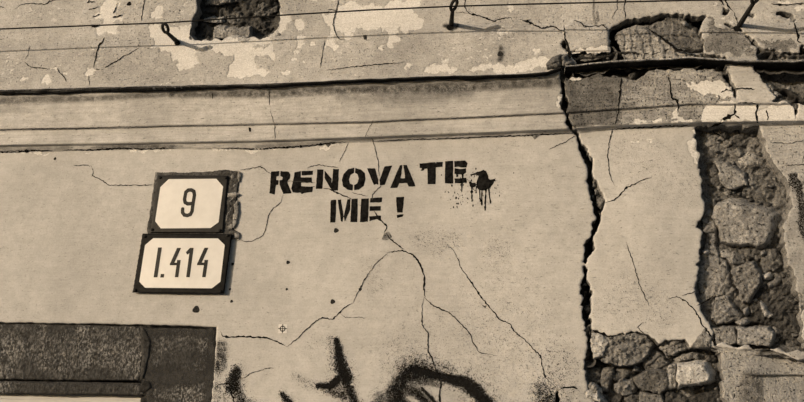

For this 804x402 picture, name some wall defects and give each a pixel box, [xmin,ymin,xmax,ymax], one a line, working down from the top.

crack [87,0,141,85]
peeling [149,0,424,79]
peeling [424,58,457,74]
crack [646,27,700,54]
crack [0,147,50,155]
crack [74,147,177,186]
crack [216,0,687,402]
flaking render [470,14,804,402]